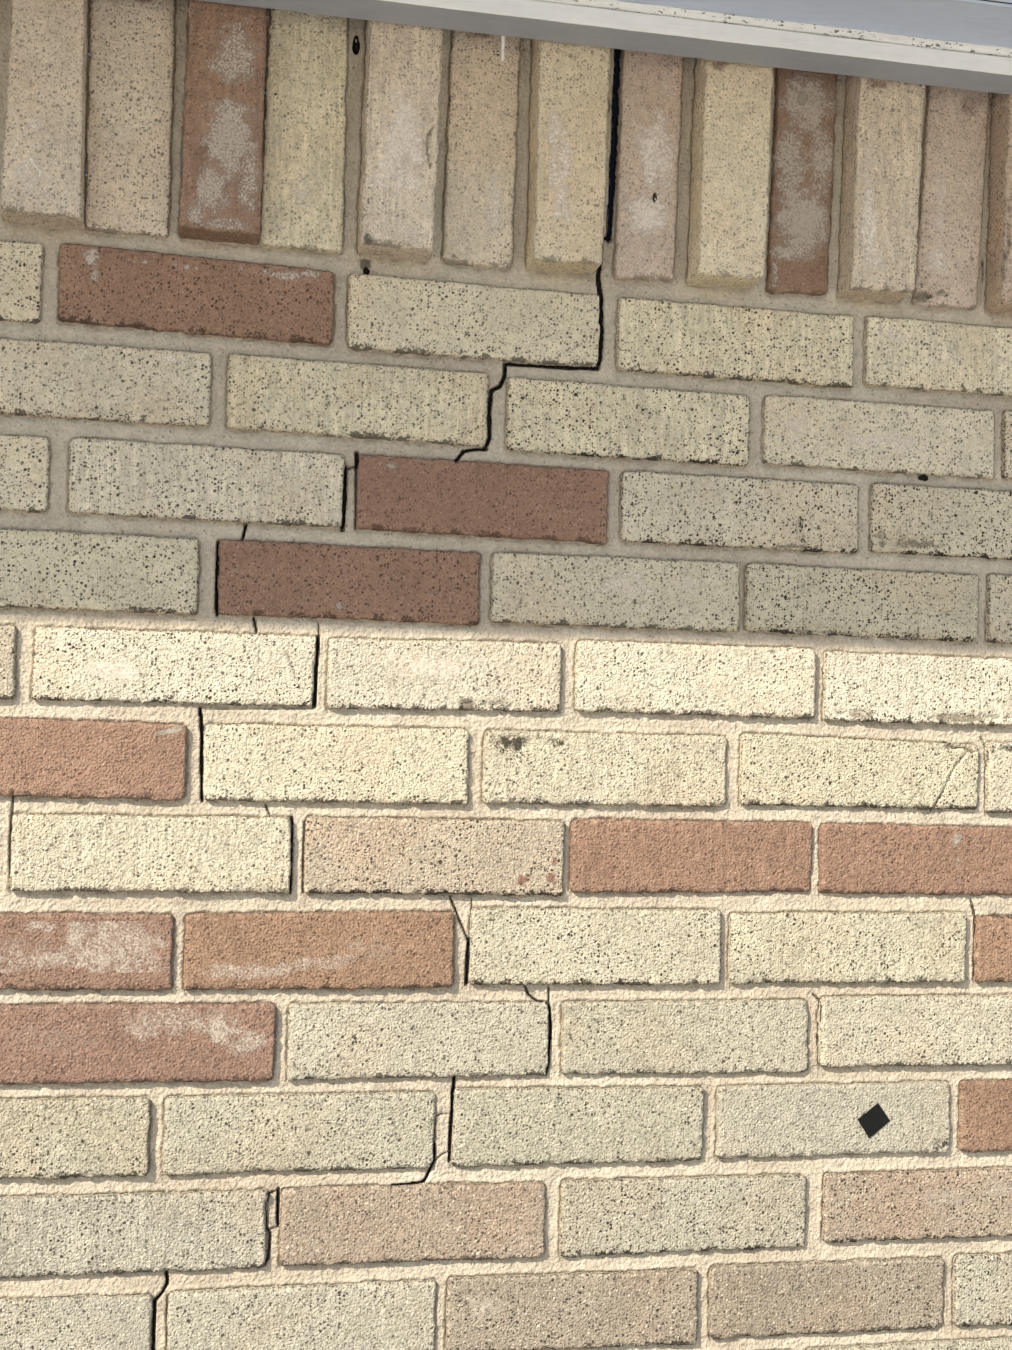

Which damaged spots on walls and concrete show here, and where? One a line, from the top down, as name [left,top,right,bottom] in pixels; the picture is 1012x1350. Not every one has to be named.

crack [455,49,621,462]
crack [341,453,359,530]
crack [199,622,319,800]
crack [265,804,305,892]
efflorescence [0,921,168,974]
efflorescence [203,955,353,980]
crack [450,897,472,984]
efflorescence [124,1008,266,1052]
crack [525,986,552,1073]
crack [391,1076,455,1185]
crack [258,1189,279,1268]
crack [151,1272,168,1350]